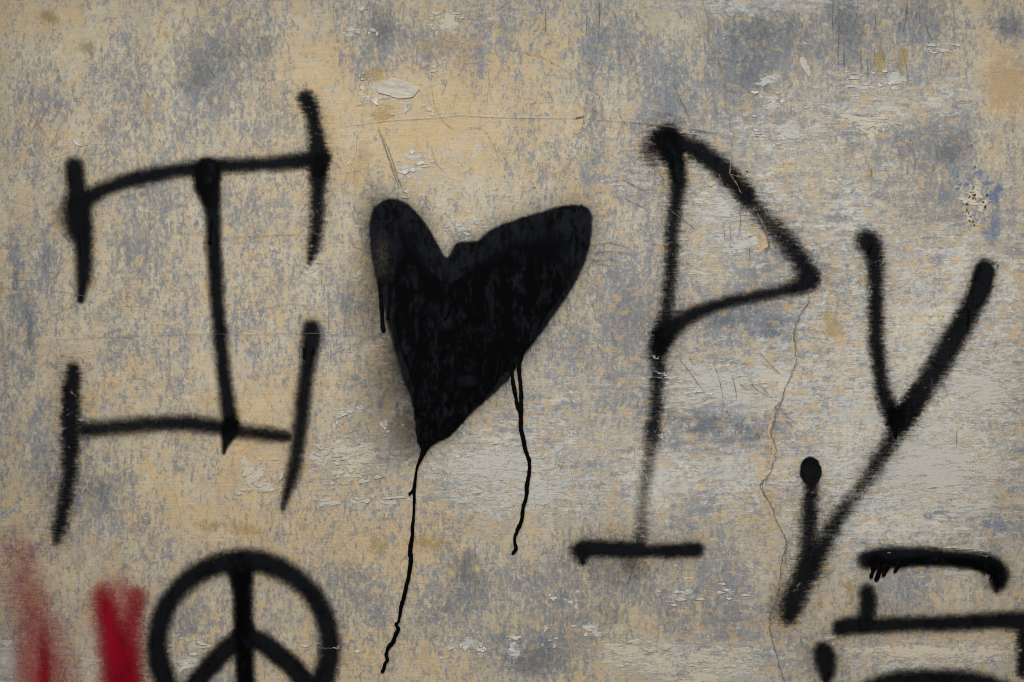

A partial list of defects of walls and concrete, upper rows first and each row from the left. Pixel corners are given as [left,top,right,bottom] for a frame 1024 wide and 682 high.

flaking render [358,72,439,116]
flaking render [396,146,434,199]
flaking render [335,405,404,433]
flaking render [234,456,284,495]
crack [760,262,853,682]